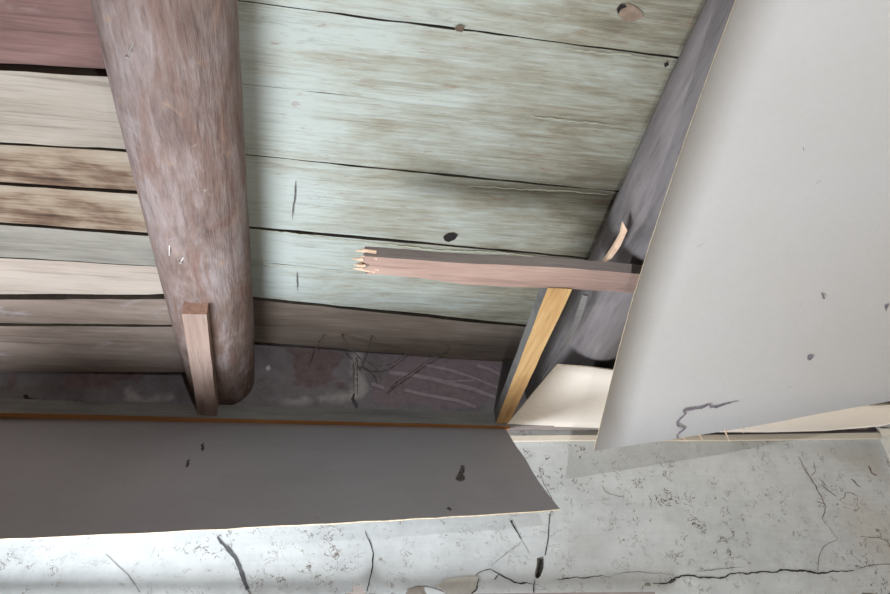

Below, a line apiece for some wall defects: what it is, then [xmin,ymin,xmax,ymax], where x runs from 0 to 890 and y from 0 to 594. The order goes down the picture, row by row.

crack [476,458,890,593]
crack [217,537,251,594]
crack [365,531,374,590]
flaking render [406,576,479,594]